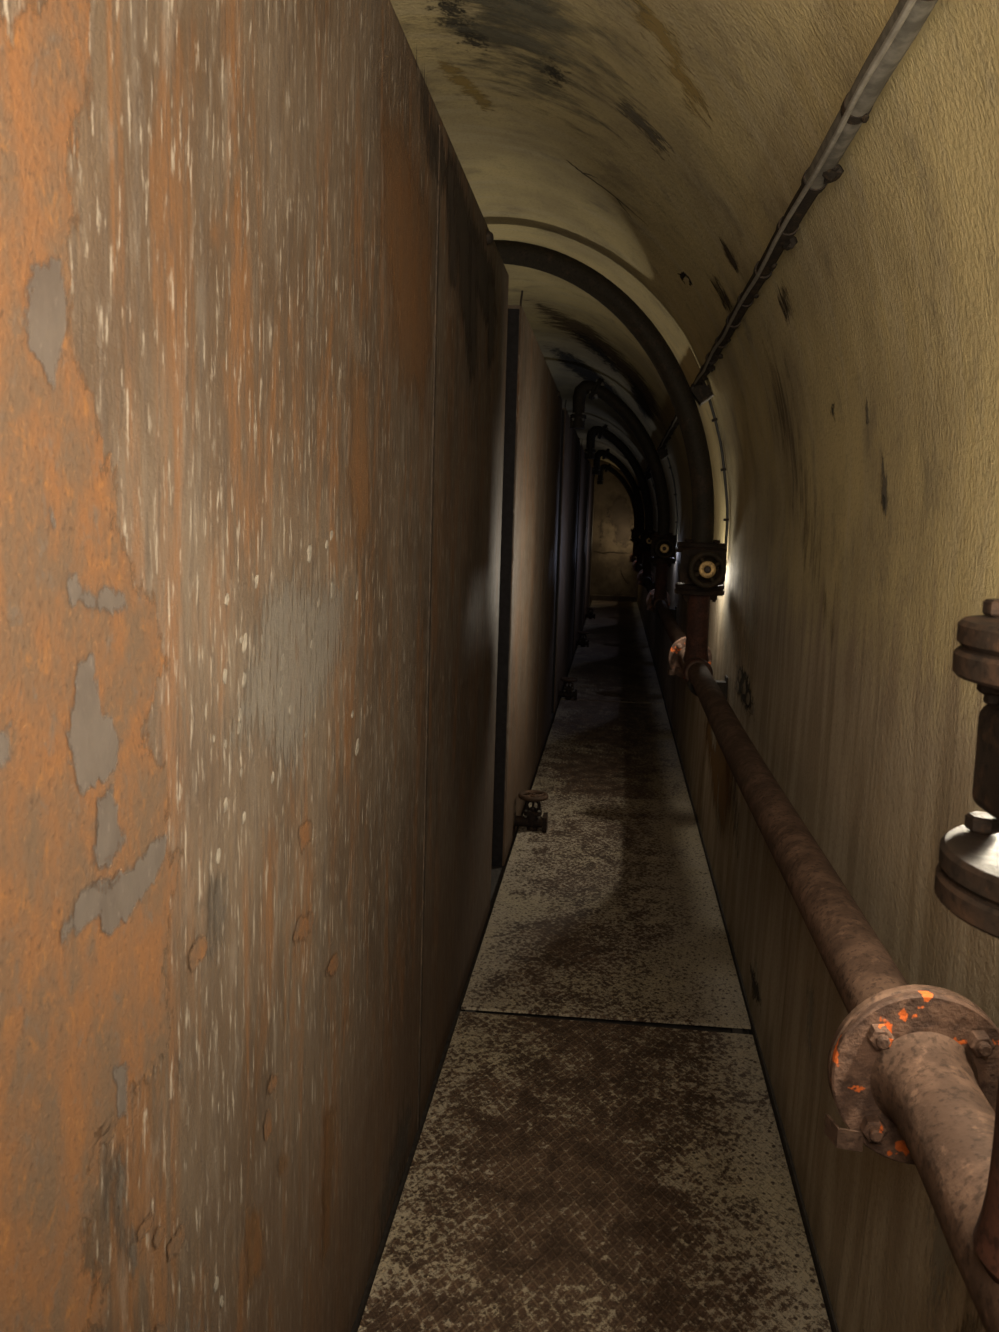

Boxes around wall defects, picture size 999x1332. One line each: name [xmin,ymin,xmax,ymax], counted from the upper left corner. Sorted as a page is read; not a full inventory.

leakage [430,0,606,111]
leakage [633,0,709,118]
leakage [616,101,668,151]
leakage [416,51,497,387]
corrosion [0,0,184,1332]